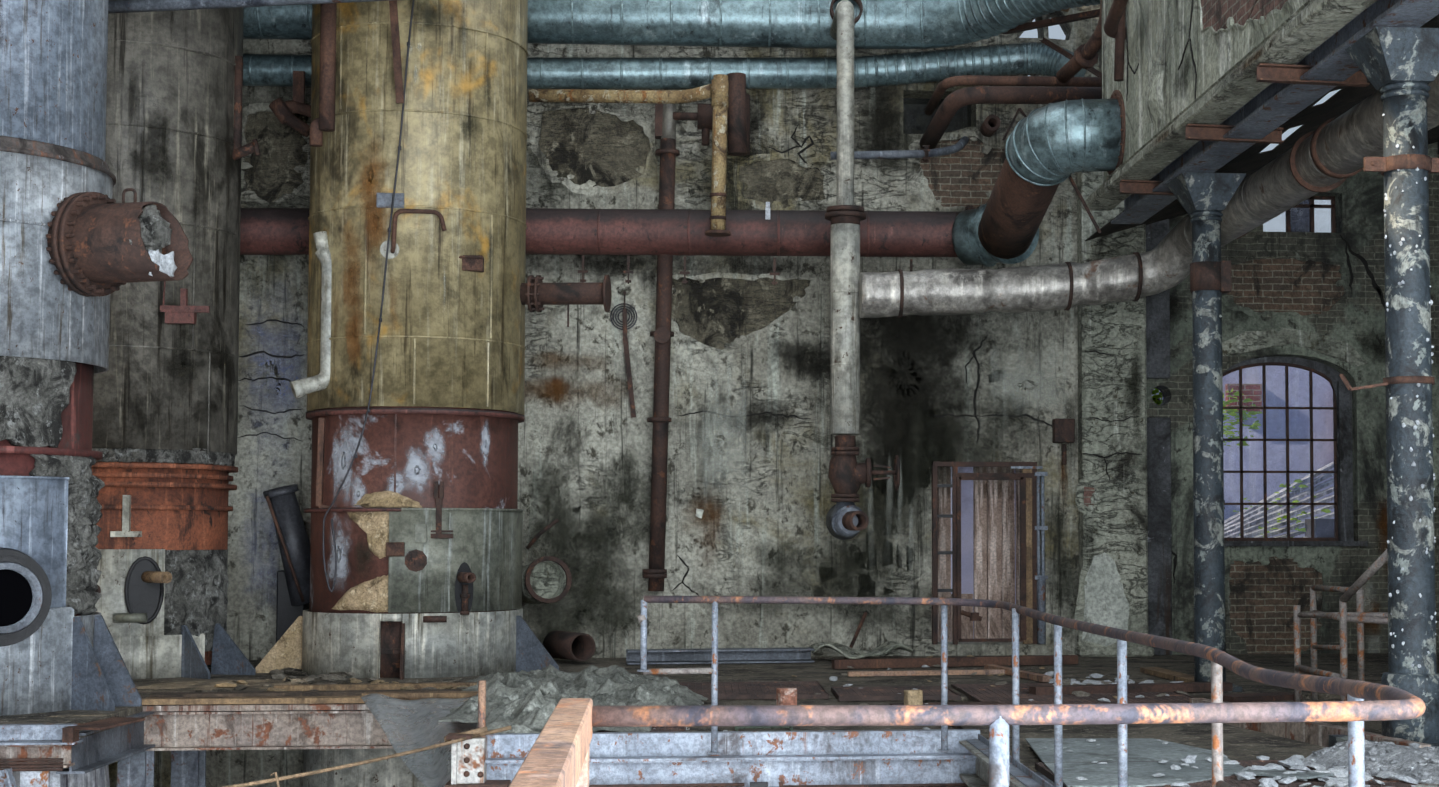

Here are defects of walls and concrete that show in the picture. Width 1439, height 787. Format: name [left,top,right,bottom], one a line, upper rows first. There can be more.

spalling [1197,0,1304,37]
spalling [528,103,657,197]
corrosion [344,163,386,295]
spalling [671,271,820,355]
peeling [334,432,364,506]
peeling [389,433,444,493]
peeling [481,427,490,462]
water stain [725,403,792,446]
water stain [760,314,1003,624]
peeling [329,531,348,578]
water stain [1054,558,1079,634]